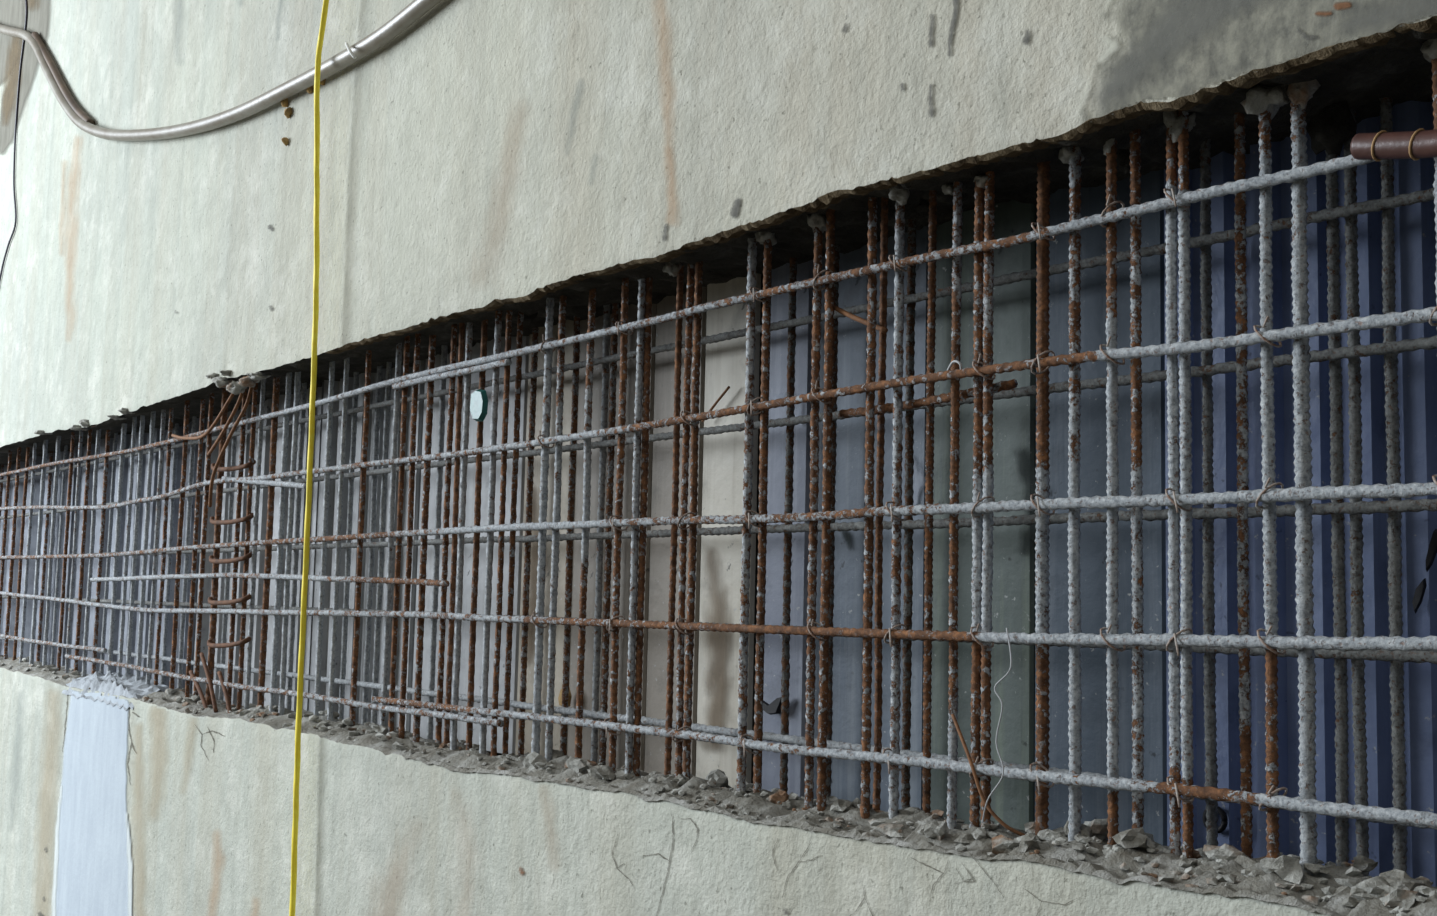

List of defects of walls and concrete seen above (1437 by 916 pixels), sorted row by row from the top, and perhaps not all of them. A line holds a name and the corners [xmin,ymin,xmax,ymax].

damp [0,0,50,154]
damp [1100,0,1437,114]
spalling [0,370,310,716]
spalling [403,757,1376,916]